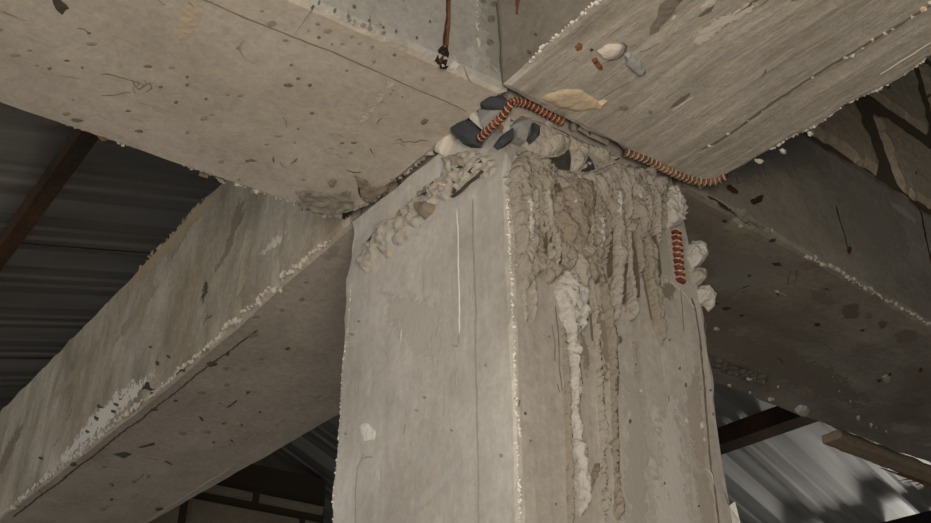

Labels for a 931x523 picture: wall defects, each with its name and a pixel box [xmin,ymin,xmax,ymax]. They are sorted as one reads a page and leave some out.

water stain [57,370,155,464]
water stain [112,187,220,346]
spalling [9,240,331,510]
spalling [183,89,728,522]